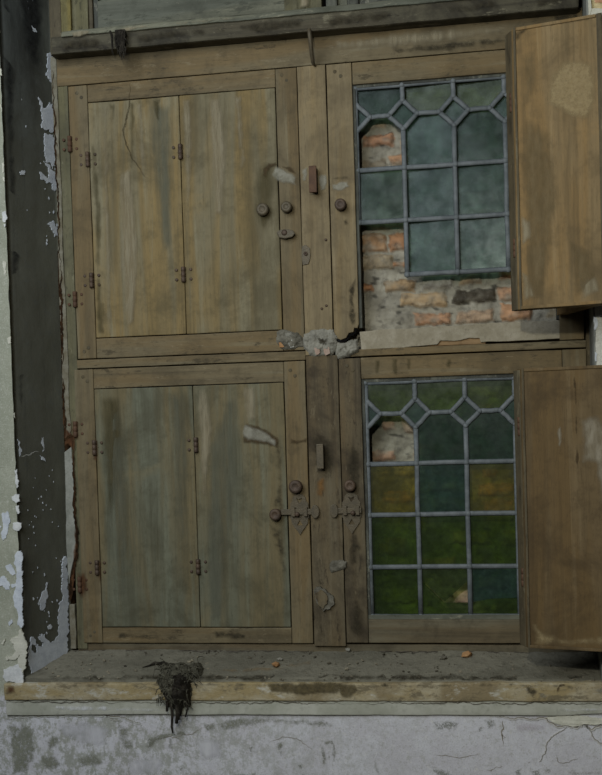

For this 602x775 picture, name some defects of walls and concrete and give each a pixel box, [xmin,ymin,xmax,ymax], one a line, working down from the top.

flaking render [588,0,602,15]
peeling [45,53,53,83]
peeling [38,97,57,200]
flaking render [0,551,70,683]
crack [193,701,602,764]